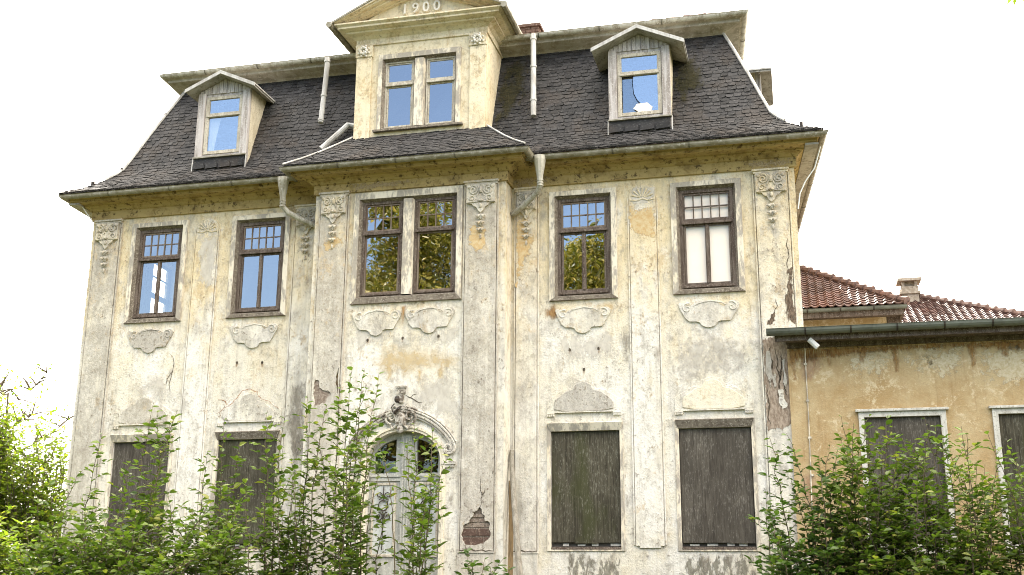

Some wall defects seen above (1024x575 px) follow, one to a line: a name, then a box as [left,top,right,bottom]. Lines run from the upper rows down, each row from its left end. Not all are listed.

peeling [628,187,657,242]
peeling [762,239,796,431]
leakage [383,352,450,378]
spalling [313,370,339,411]
spalling [462,508,494,548]